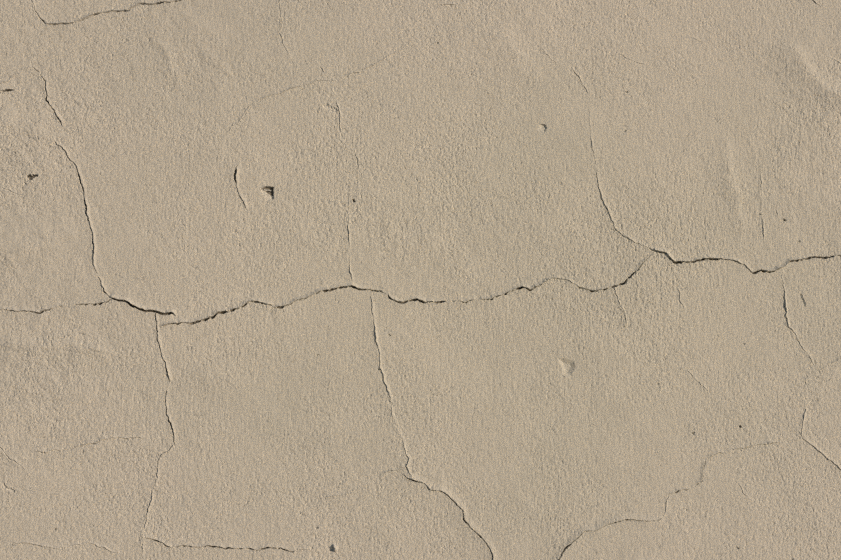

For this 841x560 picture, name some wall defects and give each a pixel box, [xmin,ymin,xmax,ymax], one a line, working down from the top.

crack [27,0,187,28]
crack [0,64,64,128]
crack [314,57,361,172]
crack [570,66,591,97]
crack [0,105,841,482]
crack [139,390,315,555]
crack [660,440,781,517]